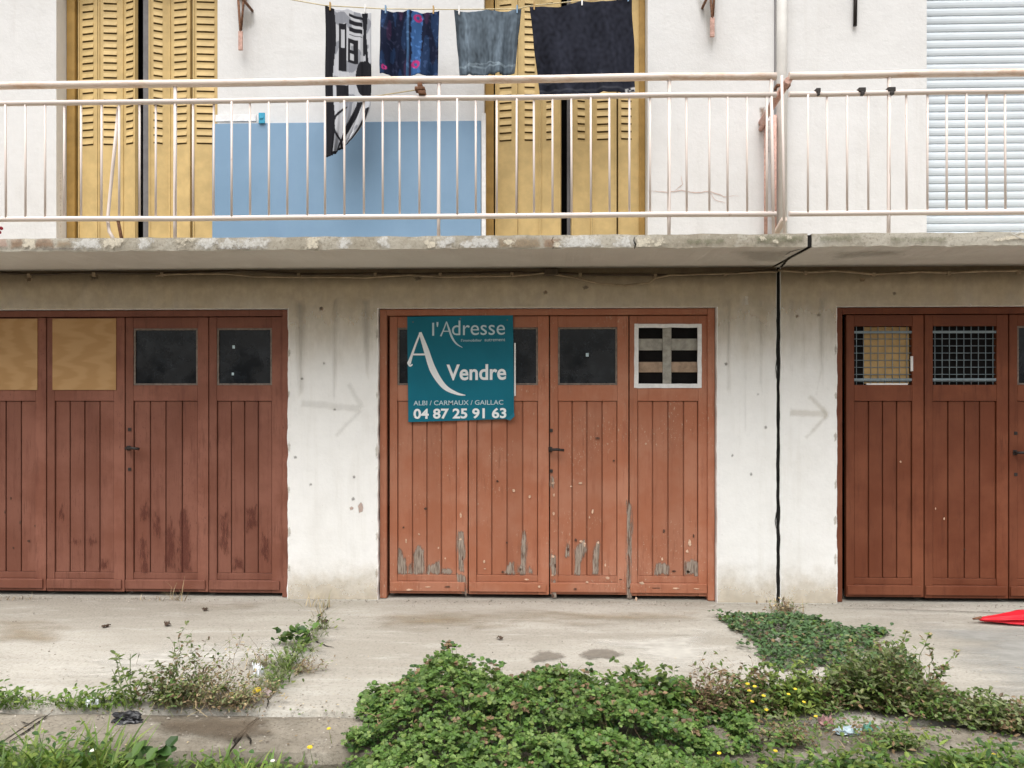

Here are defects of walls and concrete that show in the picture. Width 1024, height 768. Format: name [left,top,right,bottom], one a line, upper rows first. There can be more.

crack [656,177,725,203]
peeling [398,526,467,596]
peeling [502,502,644,601]
peeling [654,534,698,589]